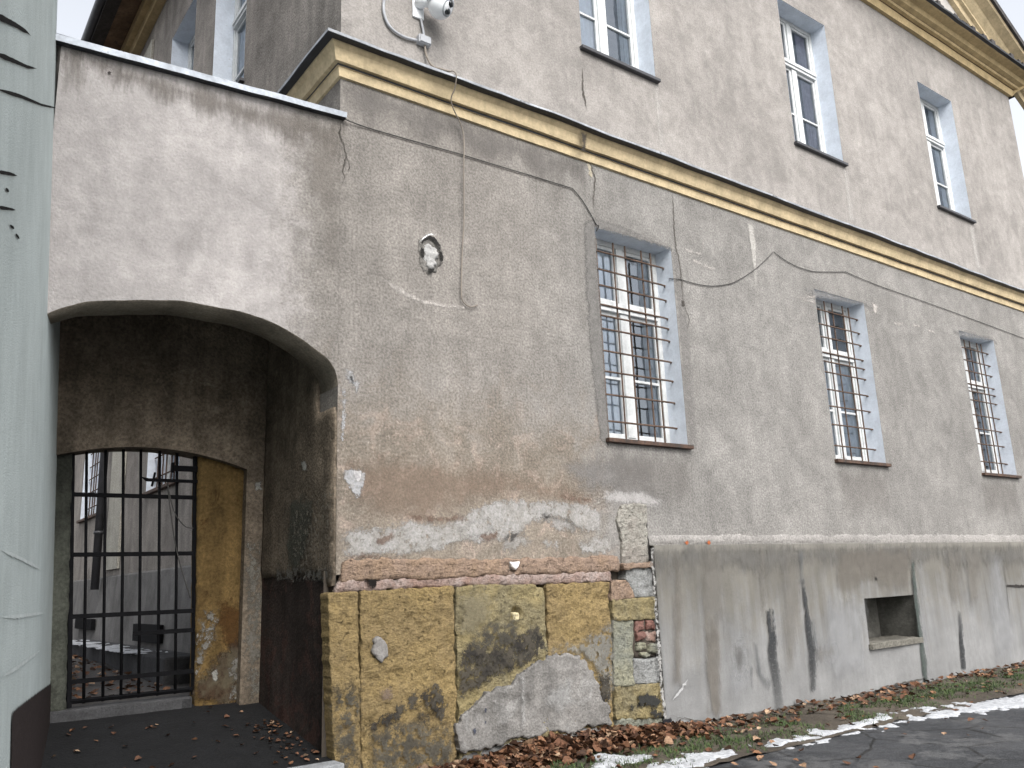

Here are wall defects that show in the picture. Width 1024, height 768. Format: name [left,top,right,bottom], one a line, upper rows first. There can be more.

crack [338,123,350,183]
spalling [418,233,444,275]
crack [672,197,690,329]
peeling [344,469,365,498]
peeling [276,493,613,582]
peeling [195,542,262,700]
leakage [461,593,545,668]
leakage [629,546,848,721]
leakage [860,545,1024,683]
peeling [598,673,611,702]